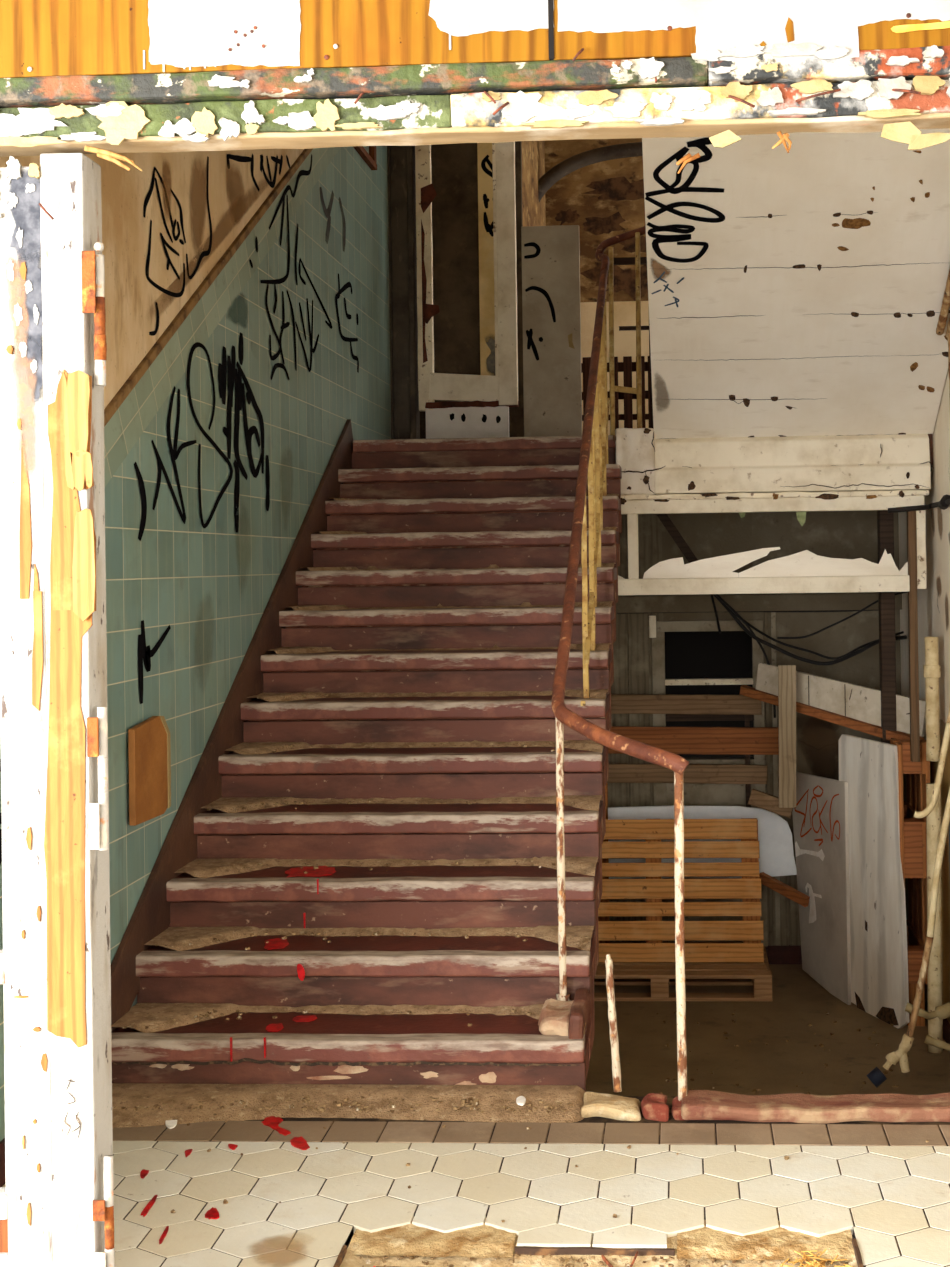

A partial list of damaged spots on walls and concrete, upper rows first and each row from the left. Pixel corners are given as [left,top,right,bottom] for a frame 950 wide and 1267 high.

peeling [0,74,421,180]
peeling [294,68,315,83]
peeling [482,17,950,153]
peeling [19,370,96,1048]
spalling [350,1217,516,1258]
spalling [677,1220,855,1262]